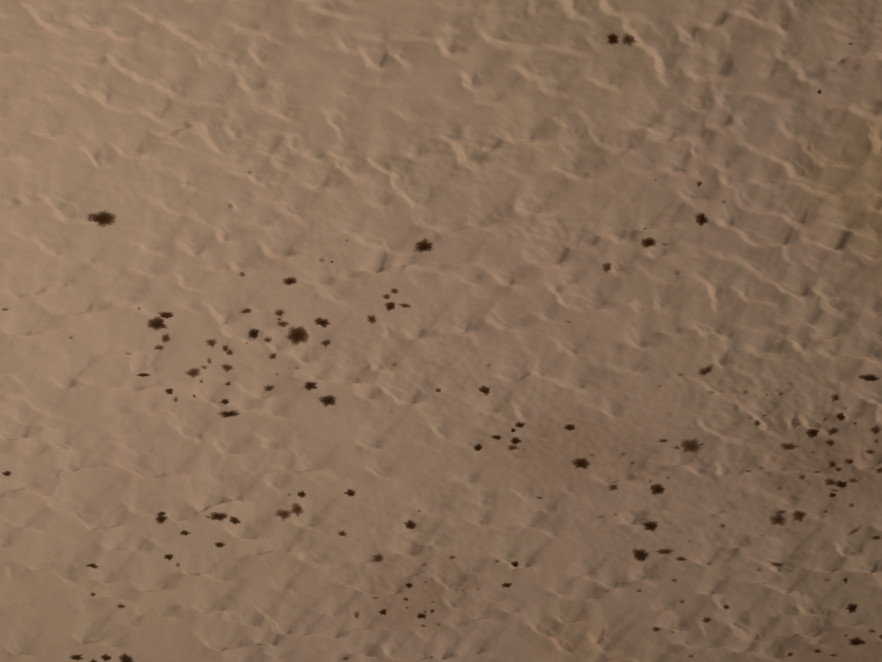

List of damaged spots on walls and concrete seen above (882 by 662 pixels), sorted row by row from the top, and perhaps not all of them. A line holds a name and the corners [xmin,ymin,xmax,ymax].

damp [383,289,410,311]
damp [148,312,172,350]
damp [275,310,308,345]
damp [207,340,232,385]
damp [304,382,335,406]
damp [446,391,882,540]
damp [633,549,686,561]
damp [336,520,511,658]
damp [509,581,704,662]
damp [722,604,882,662]